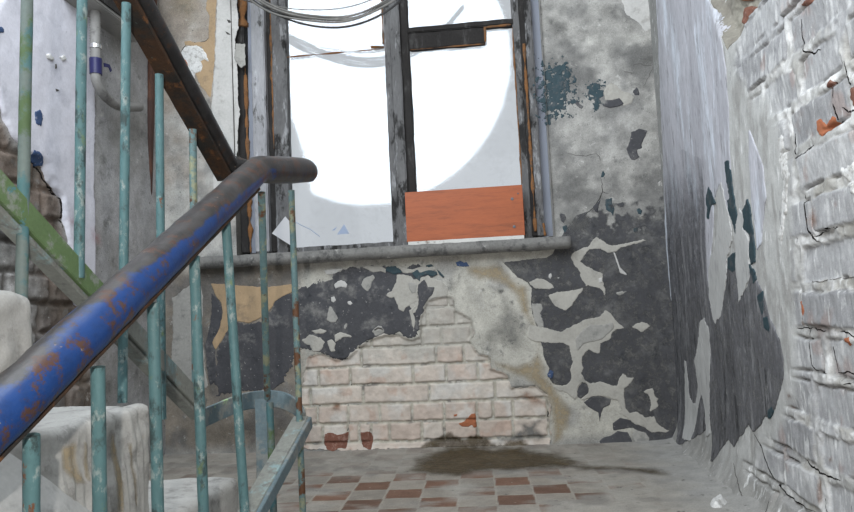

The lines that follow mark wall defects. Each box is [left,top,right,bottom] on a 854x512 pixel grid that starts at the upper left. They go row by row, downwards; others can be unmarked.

crack [801,19,820,55]
peeling [0,0,21,143]
crack [832,62,854,124]
peeling [31,0,76,250]
peeling [85,17,96,274]
spalling [816,116,841,136]
flaking render [171,0,784,462]
crack [804,196,838,242]
damp [473,268,527,312]
crack [798,327,854,385]
crack [754,434,827,512]
crack [789,456,840,481]